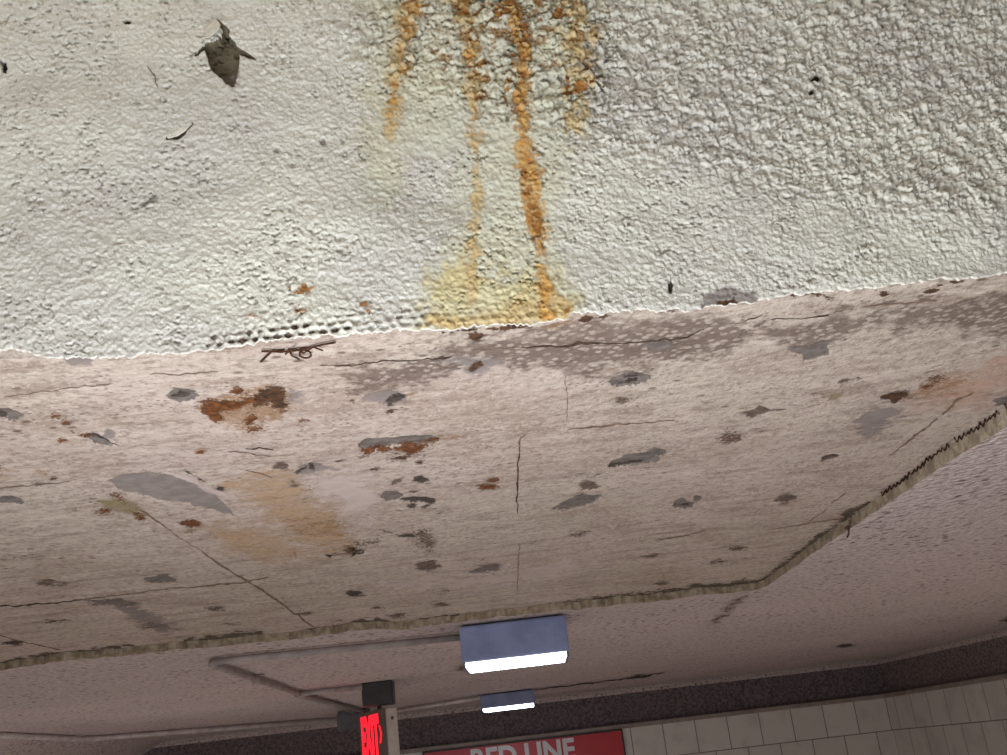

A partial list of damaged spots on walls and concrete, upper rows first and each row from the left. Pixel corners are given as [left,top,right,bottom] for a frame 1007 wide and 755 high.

spalling [195,19,256,87]
rust [364,0,600,342]
rust [194,384,301,435]
rust [358,435,440,465]
crack [516,435,525,514]